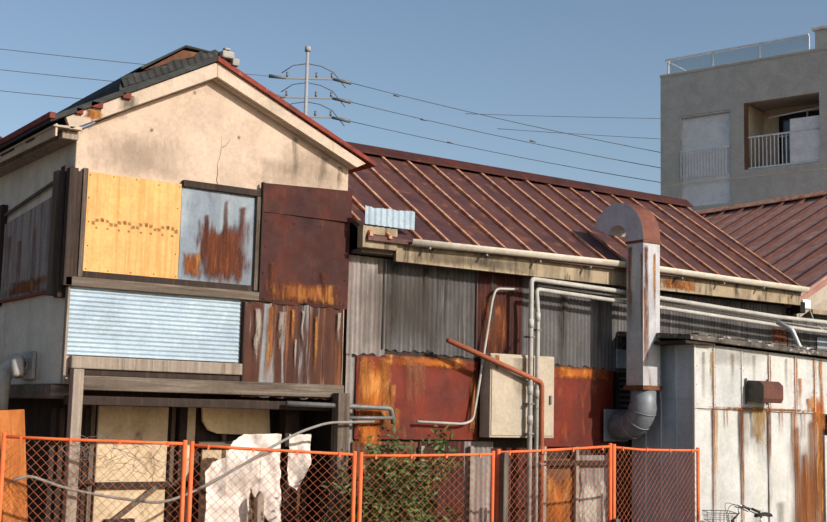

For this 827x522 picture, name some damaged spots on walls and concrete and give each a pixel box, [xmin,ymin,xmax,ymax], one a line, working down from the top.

corrosion [184,201,250,284]
corrosion [260,183,352,366]
corrosion [358,355,463,444]
corrosion [559,368,607,380]
corrosion [711,352,824,522]